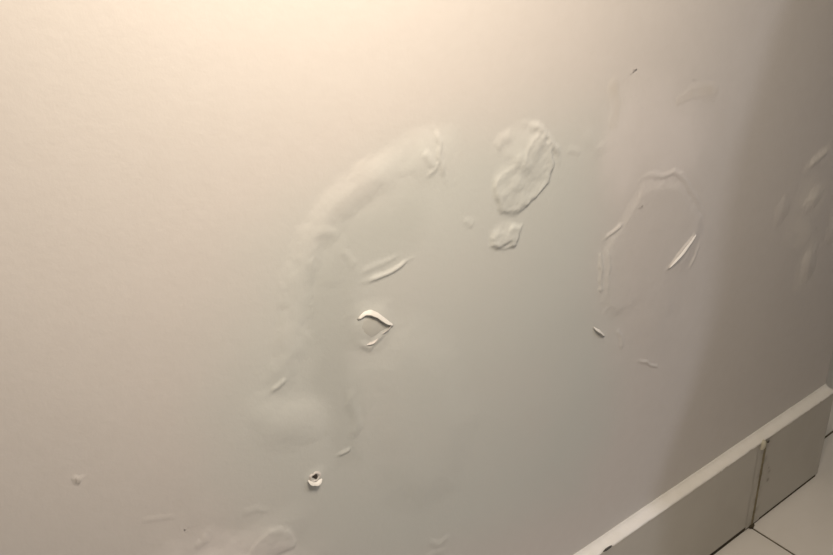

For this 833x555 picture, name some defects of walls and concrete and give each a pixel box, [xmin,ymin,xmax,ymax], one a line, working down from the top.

peeling [358,310,394,345]
spalling [308,471,322,486]